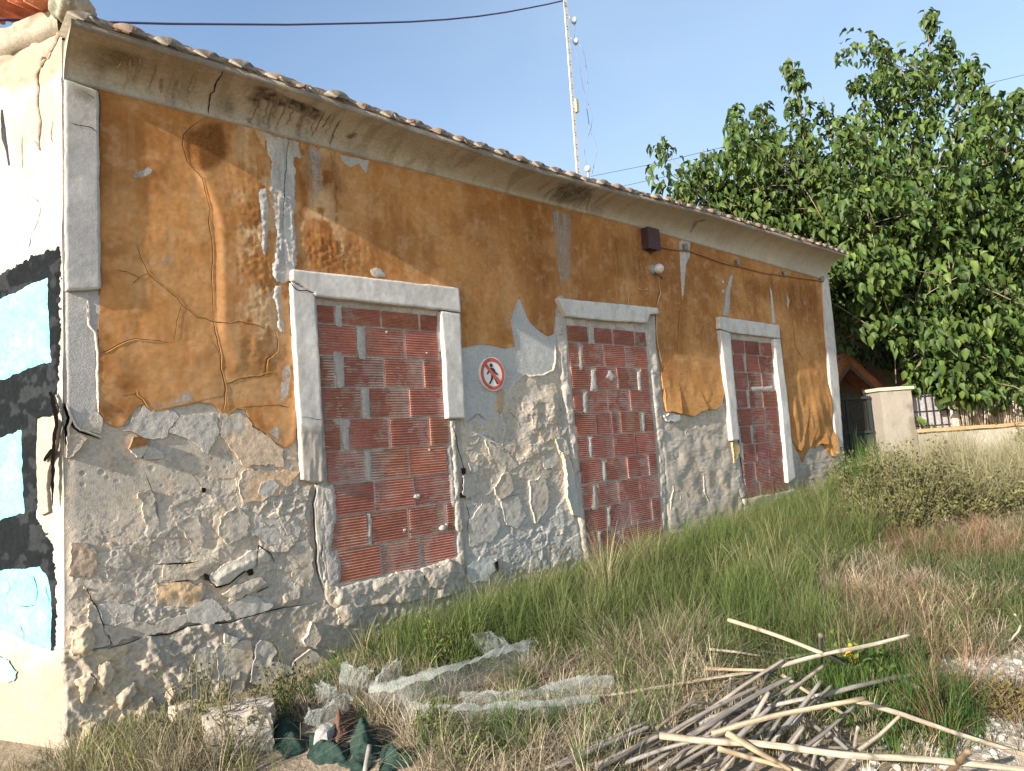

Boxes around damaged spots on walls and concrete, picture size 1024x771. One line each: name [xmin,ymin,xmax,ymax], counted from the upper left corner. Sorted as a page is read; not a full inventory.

leakage [186,125,225,169]
crack [102,71,322,420]
peeling [259,131,321,332]
leakage [249,88,341,145]
spalling [36,289,328,732]
crack [83,483,326,649]
spalling [449,295,590,592]
spalling [647,315,746,539]
spalling [792,443,844,493]
spalling [80,721,100,745]